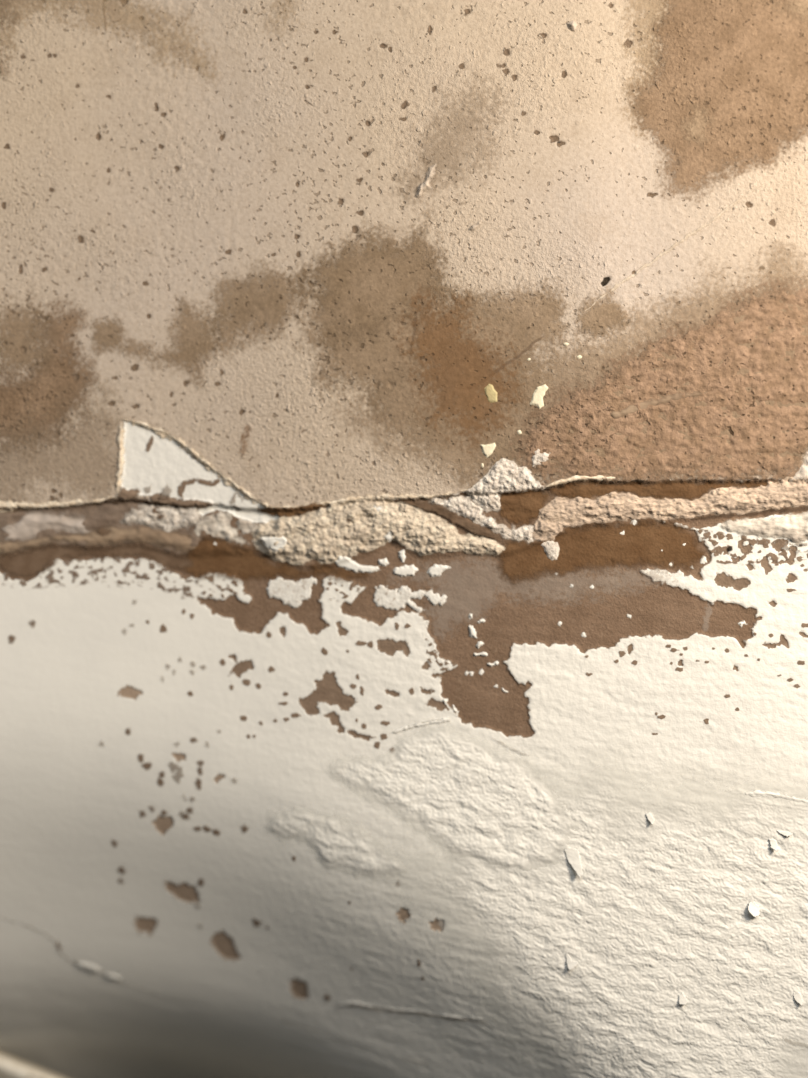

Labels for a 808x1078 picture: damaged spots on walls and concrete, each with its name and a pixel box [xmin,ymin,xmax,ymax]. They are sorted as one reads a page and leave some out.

damp [634,0,808,198]
damp [0,231,808,525]
crack [623,476,771,484]
spalling [0,279,808,753]
crack [691,507,808,520]
peeling [138,743,220,835]
peeling [166,879,204,908]
peeling [135,917,157,935]
peeling [396,908,411,924]
peeling [428,918,445,932]
peeling [210,931,241,961]
peeling [290,979,309,999]